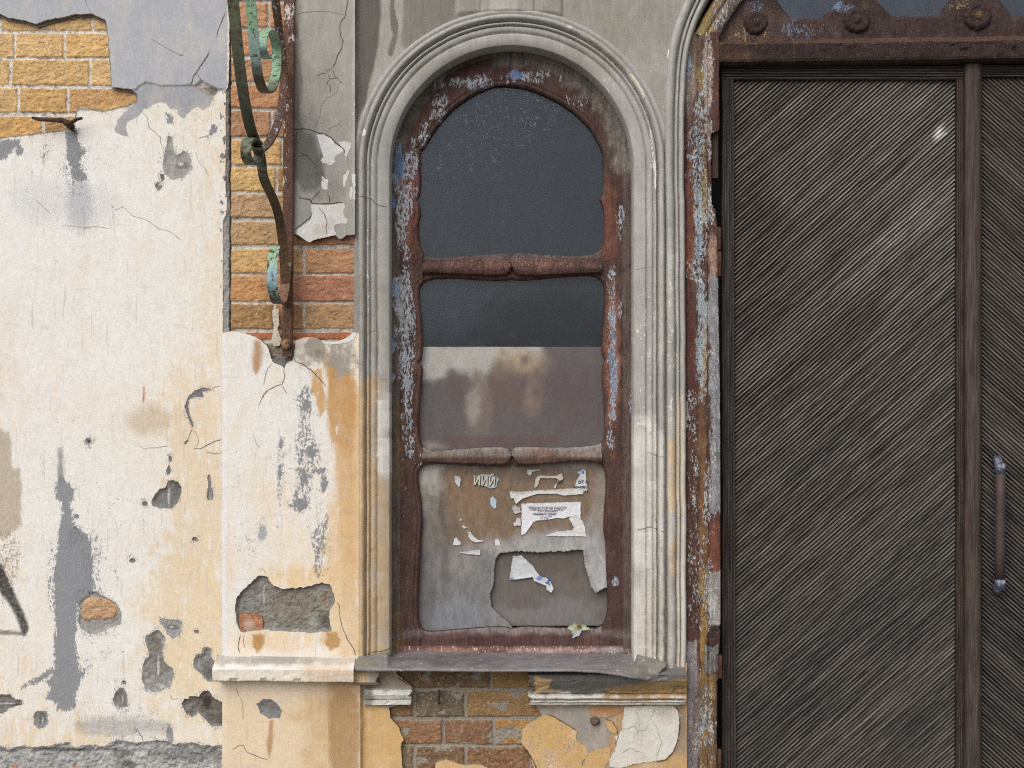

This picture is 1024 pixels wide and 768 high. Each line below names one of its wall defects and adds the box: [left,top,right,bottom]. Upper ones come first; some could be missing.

spalling [0,14,138,193]
crack [296,0,386,234]
peeling [317,134,351,190]
peeling [297,170,355,242]
crack [258,358,326,409]
spalling [142,456,181,509]
peeling [0,452,122,729]
spalling [235,515,335,633]
spalling [142,618,199,692]
spalling [182,647,222,727]
flaking render [390,671,680,768]